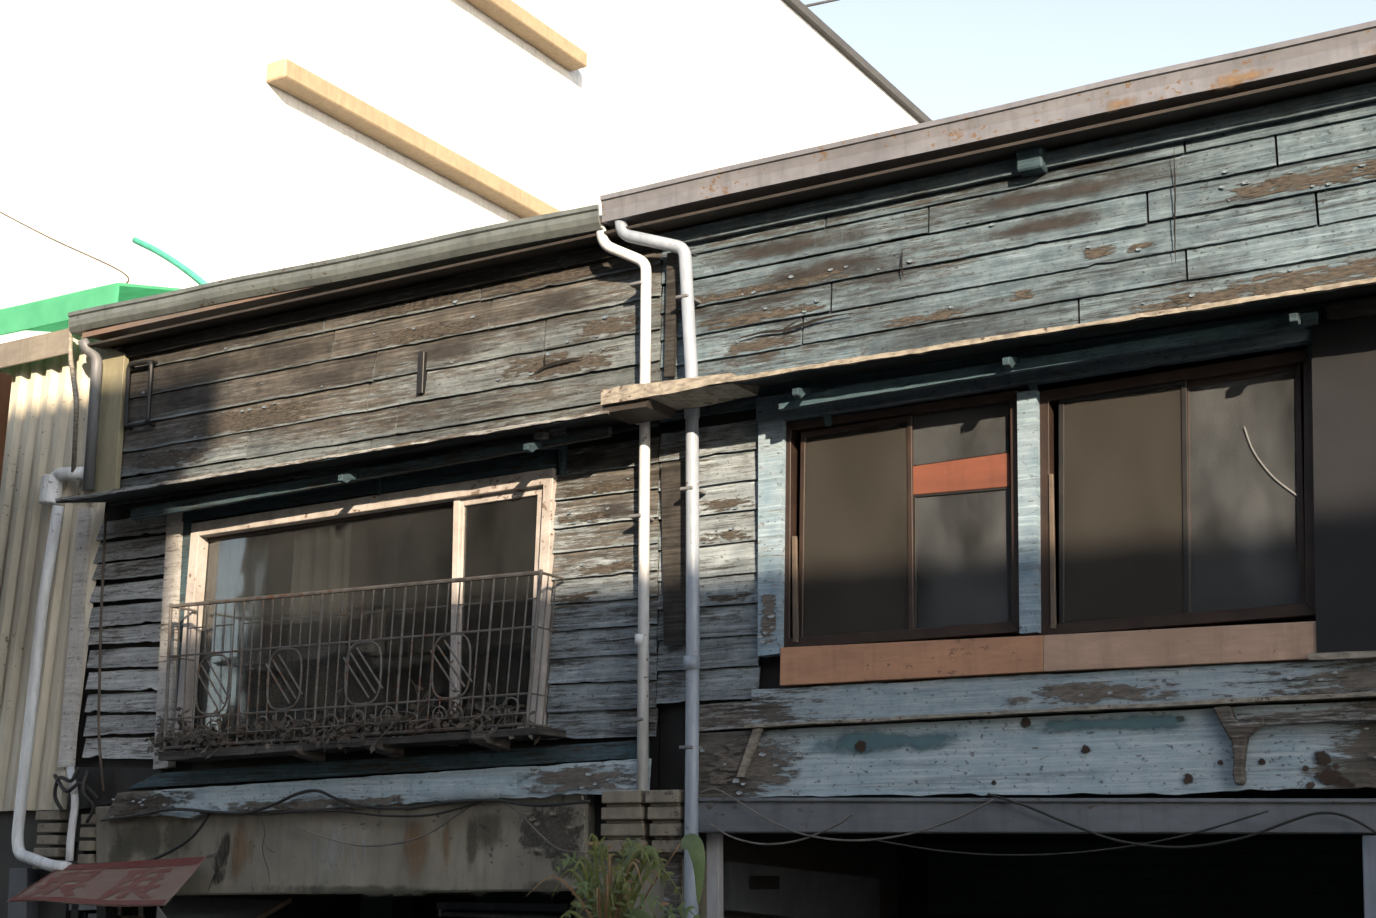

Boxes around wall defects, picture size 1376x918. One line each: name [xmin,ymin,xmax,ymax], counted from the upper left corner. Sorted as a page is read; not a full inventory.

rust [1219,71,1259,85]
peeling [1219,159,1376,201]
peeling [1083,242,1153,259]
peeling [1010,288,1034,301]
peeling [1131,257,1376,314]
peeling [1006,679,1178,710]
peeling [700,736,803,795]
rust [1302,750,1355,789]
water stain [214,833,230,883]
water stain [467,816,500,861]
water stain [289,886,421,895]